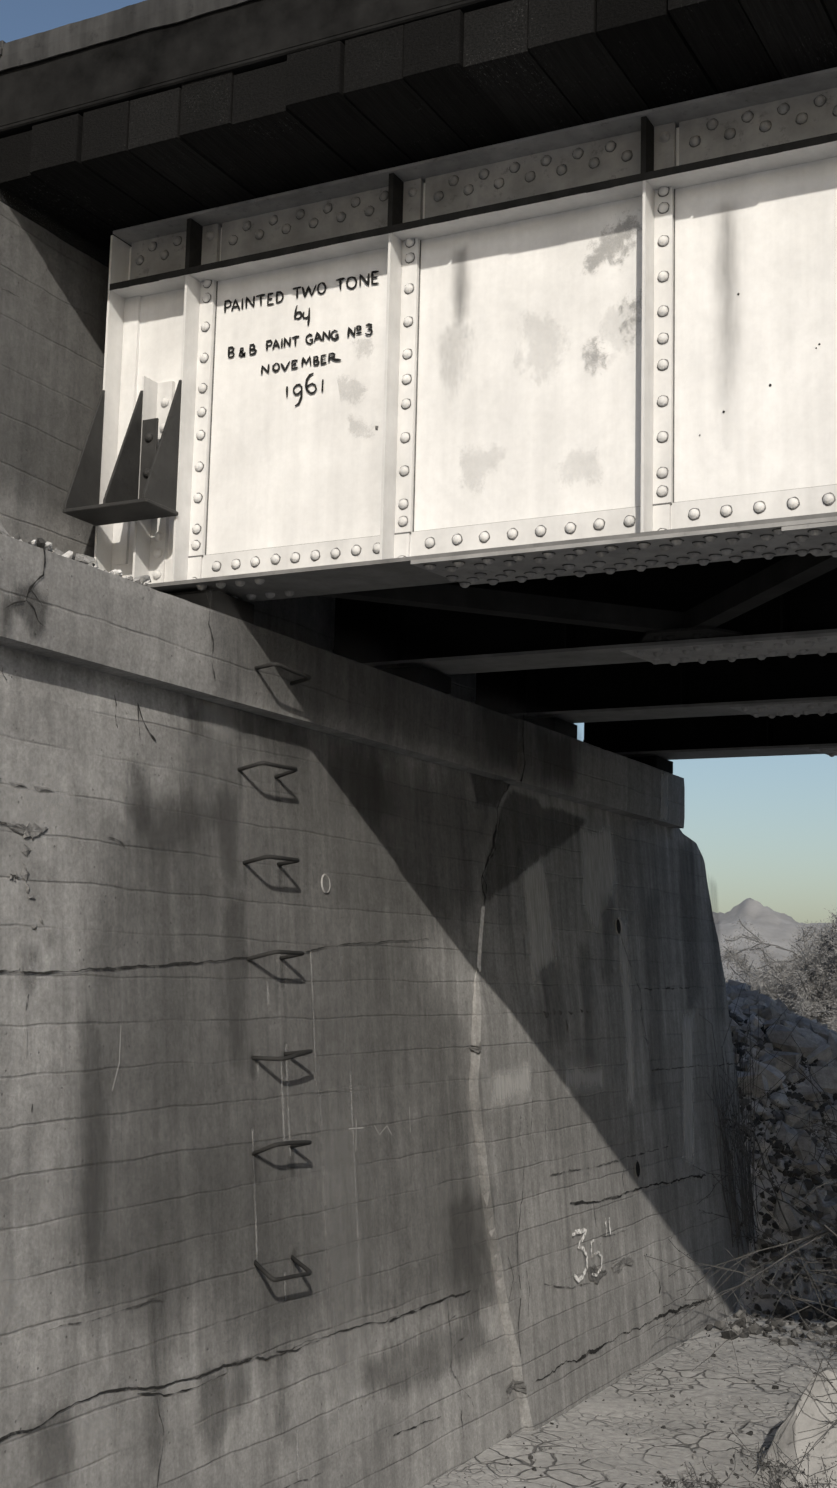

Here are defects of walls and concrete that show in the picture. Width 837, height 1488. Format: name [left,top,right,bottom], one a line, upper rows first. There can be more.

crack [6,544,46,627]
crack [481,714,526,903]
crack [0,957,248,974]
crack [306,938,426,952]
crack [508,1102,706,1381]
crack [0,1290,473,1487]